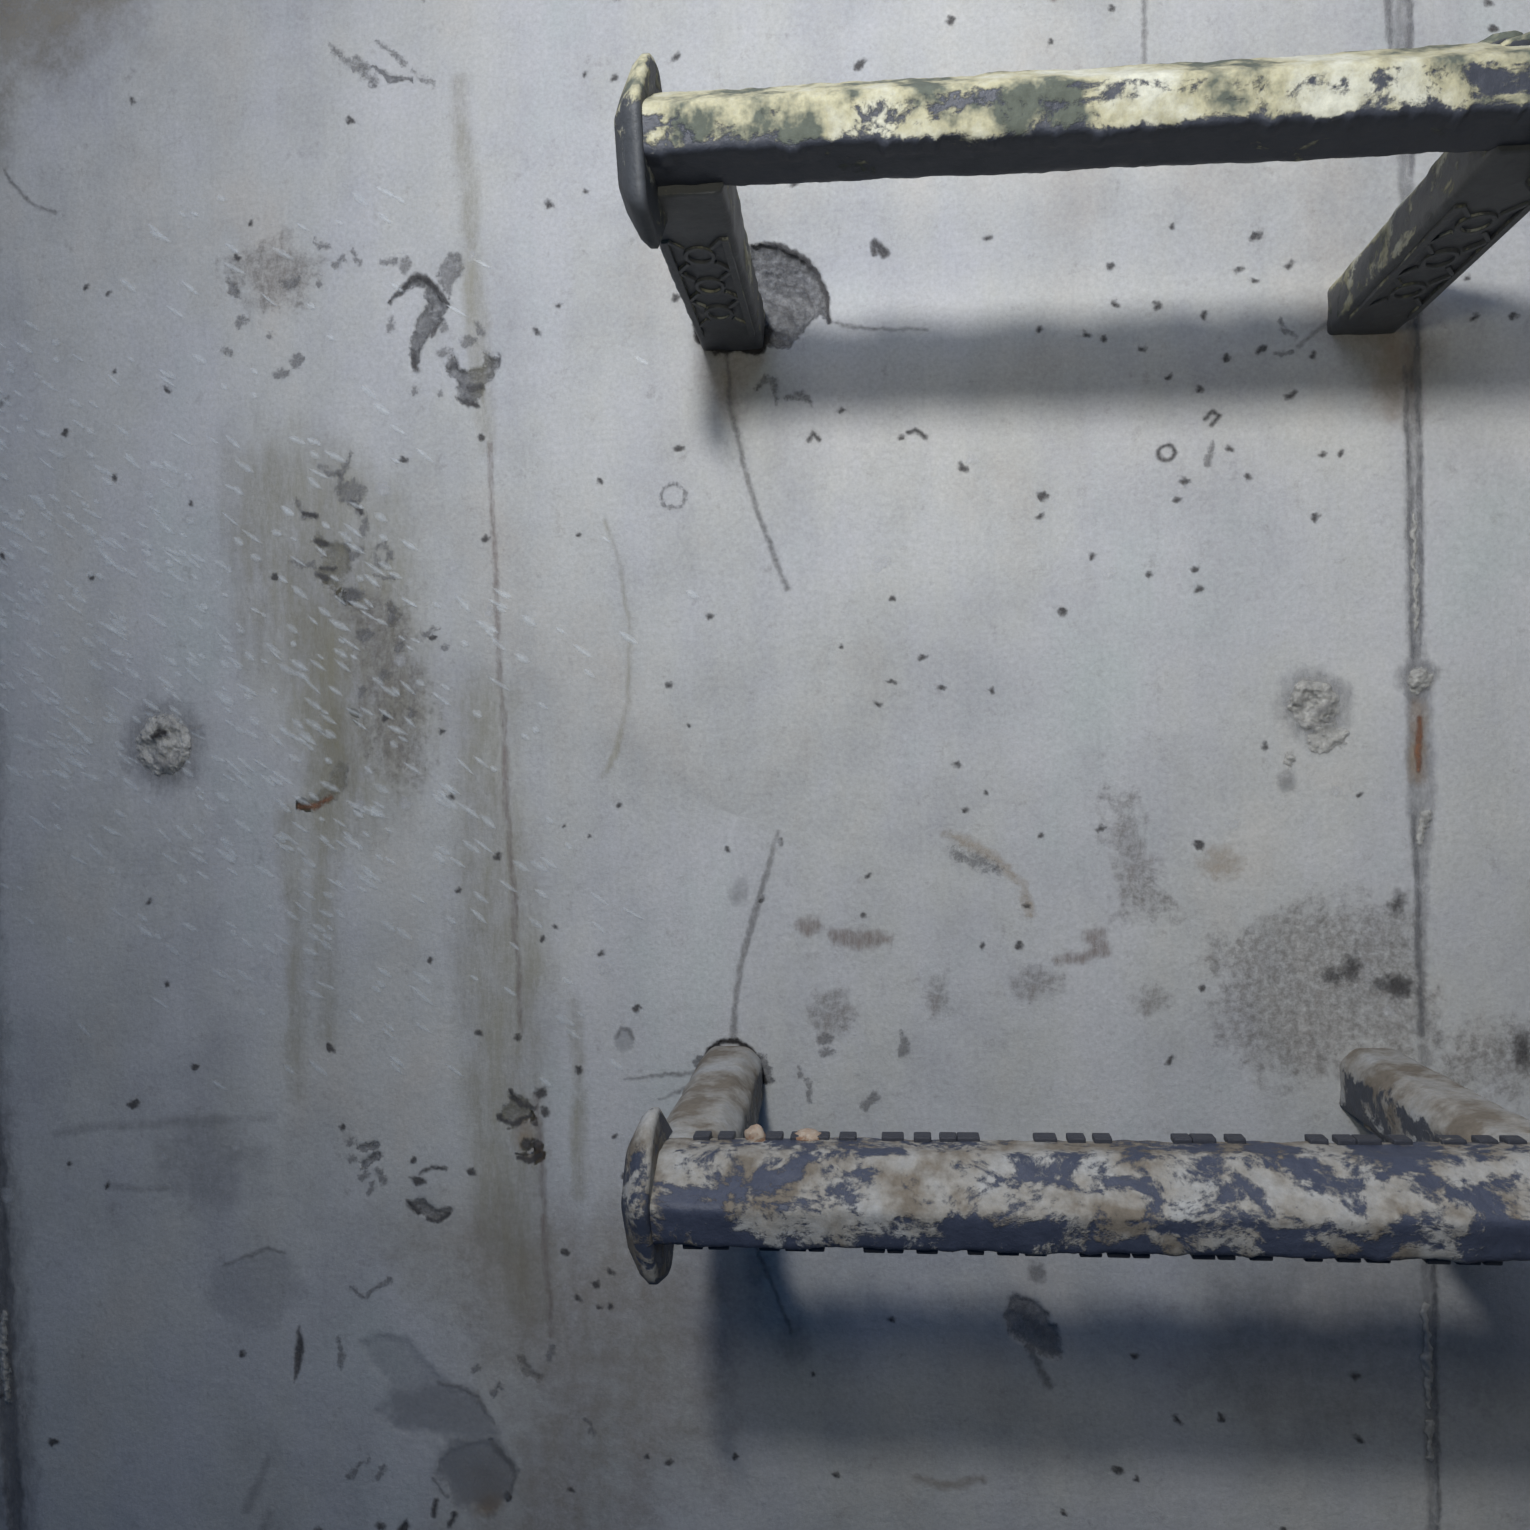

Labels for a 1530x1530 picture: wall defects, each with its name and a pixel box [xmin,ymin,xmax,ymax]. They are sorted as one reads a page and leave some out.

spalling [750,242,831,349]